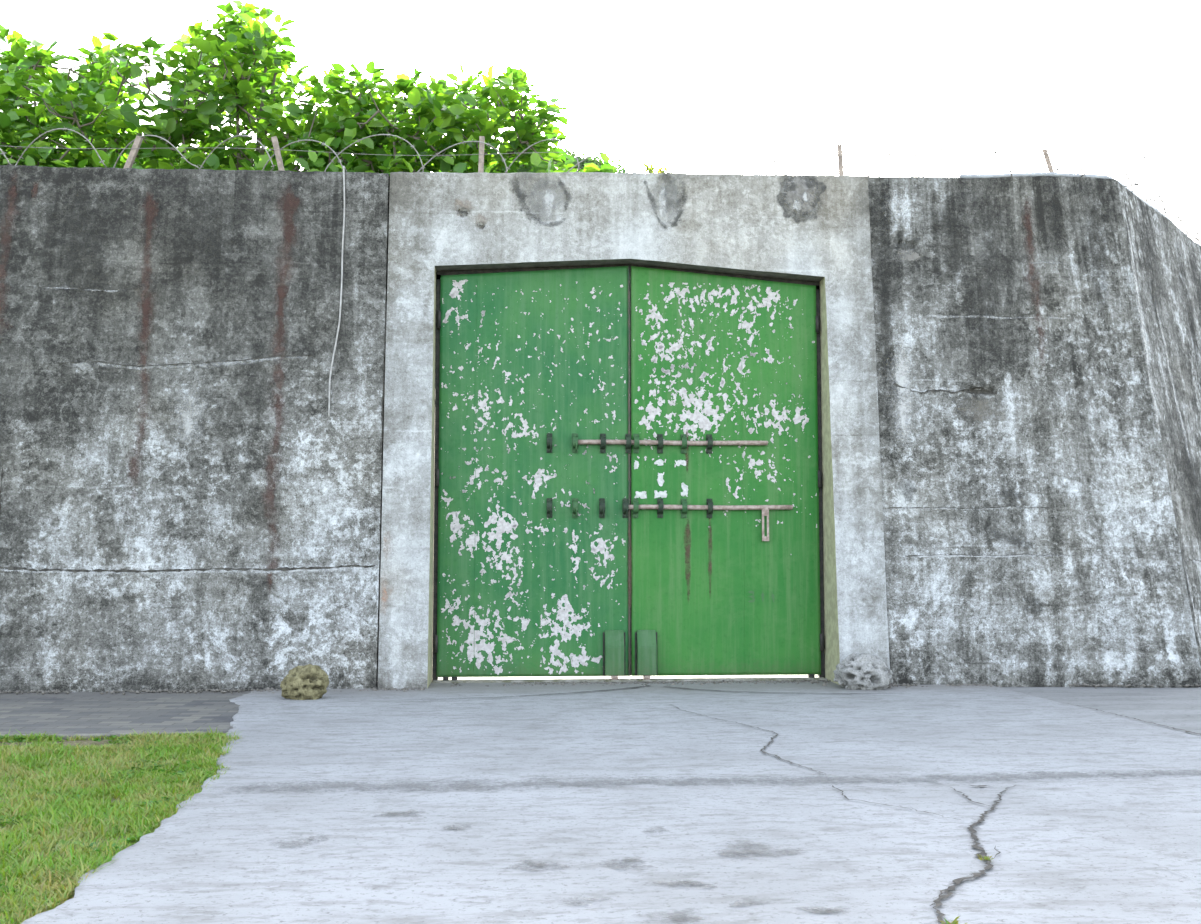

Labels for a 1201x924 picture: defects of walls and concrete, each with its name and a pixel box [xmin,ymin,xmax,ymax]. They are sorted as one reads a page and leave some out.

rust [130,194,158,496]
rust [265,193,300,585]
peeling [439,280,817,675]
crack [893,382,969,393]
leakage [1130,229,1158,394]
crack [669,704,1016,924]